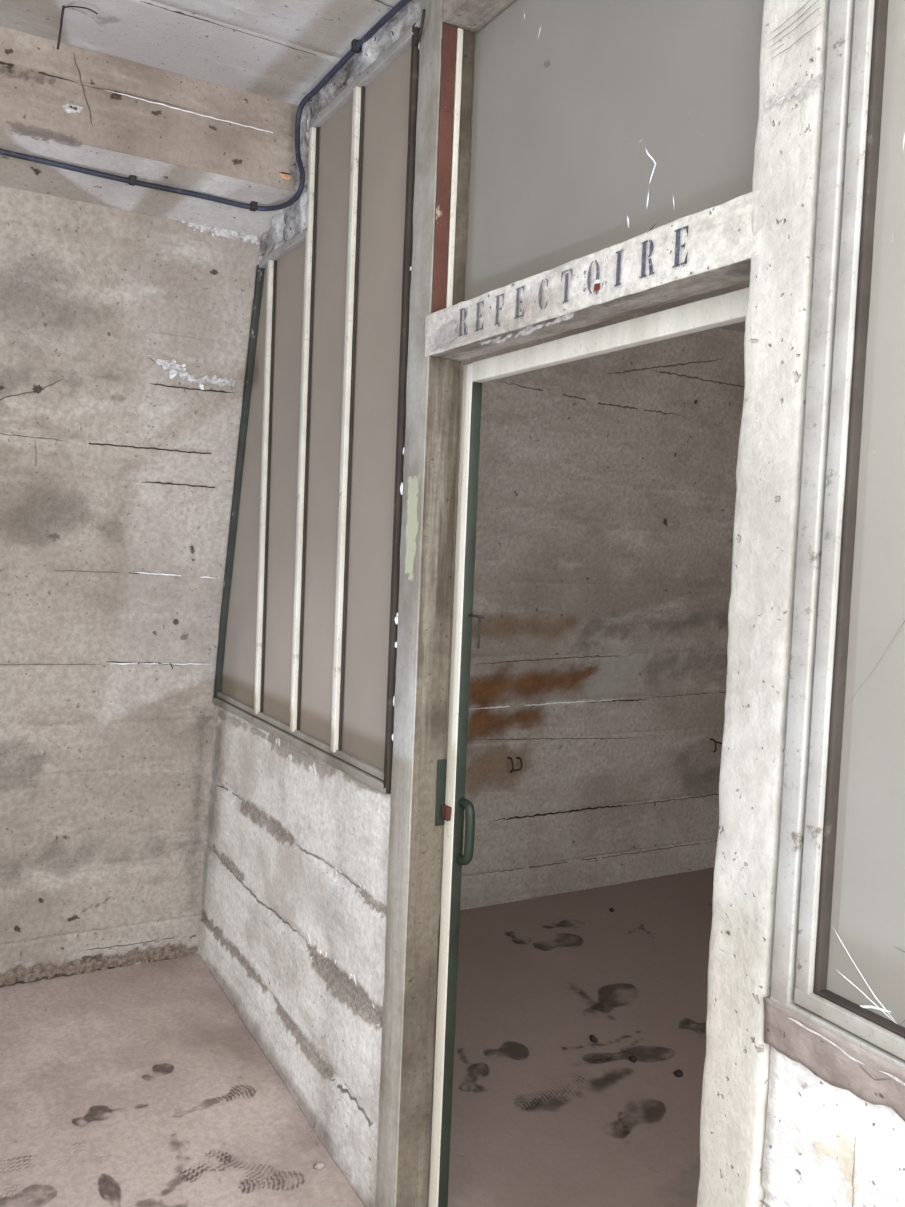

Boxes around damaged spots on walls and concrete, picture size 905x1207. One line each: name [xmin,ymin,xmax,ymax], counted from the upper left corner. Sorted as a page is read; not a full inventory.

corrosion [468,667,595,740]
spalling [0,935,197,988]